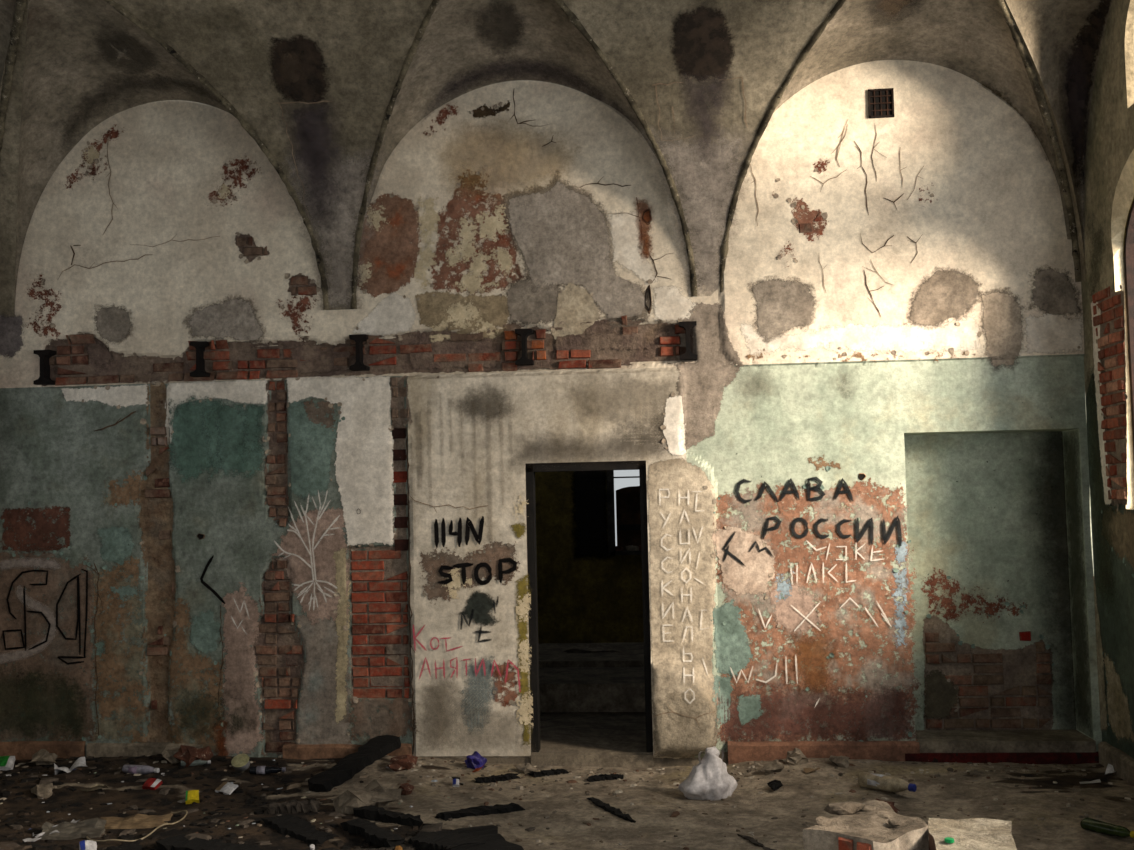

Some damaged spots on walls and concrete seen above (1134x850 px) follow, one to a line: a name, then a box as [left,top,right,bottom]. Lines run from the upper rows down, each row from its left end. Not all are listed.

crack [58,134,220,279]
water stain [270,34,337,217]
peeling [357,167,524,301]
water stain [670,7,735,144]
crack [750,164,759,226]
crack [810,120,924,317]
peeling [0,502,99,742]
spalling [26,273,695,758]
peeling [703,456,1055,743]